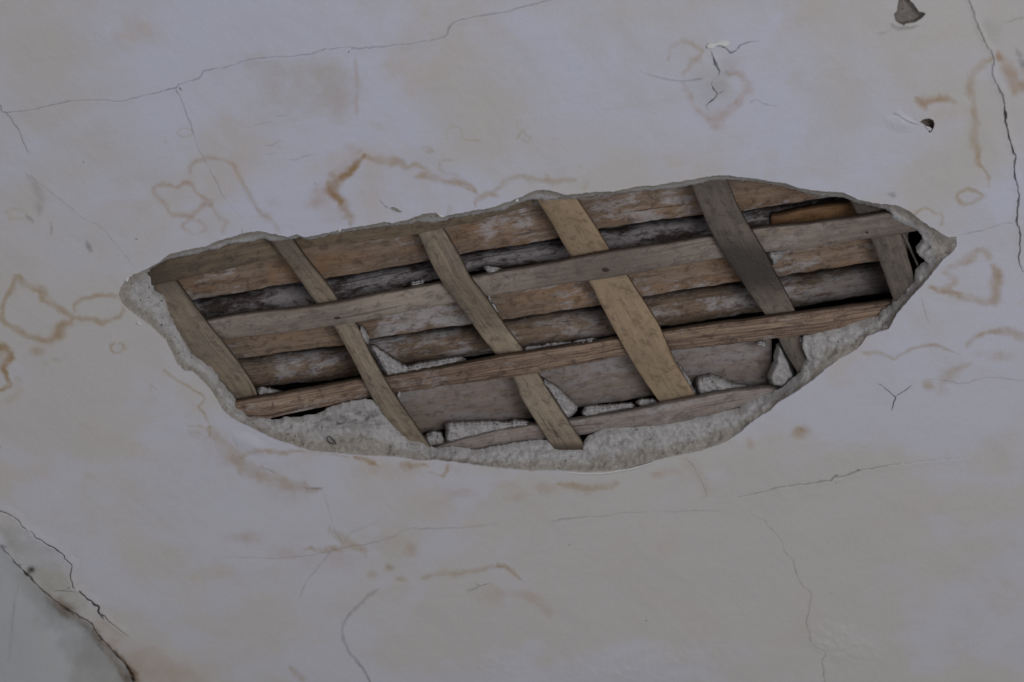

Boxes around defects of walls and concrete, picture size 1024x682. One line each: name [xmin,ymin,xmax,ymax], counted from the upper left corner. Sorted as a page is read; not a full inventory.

crack [707,41,730,103]
flaking render [894,0,925,25]
flaking render [893,110,934,132]
crack [964,0,1024,276]
flaking render [119,175,957,475]
crack [0,504,133,675]